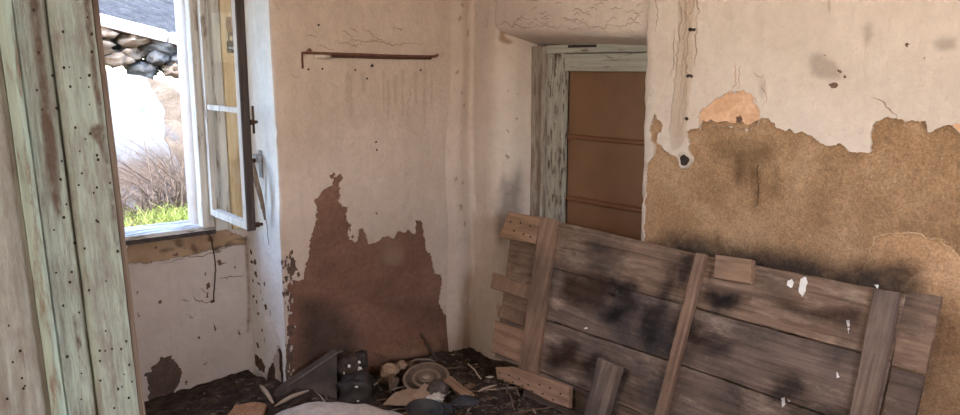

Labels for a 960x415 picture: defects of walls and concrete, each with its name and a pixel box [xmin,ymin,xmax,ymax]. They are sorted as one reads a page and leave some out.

crack [308,27,426,124]
crack [475,0,700,141]
flaking render [644,90,960,276]
flaking render [144,355,188,400]
flaking render [253,172,449,383]
flaking render [682,365,826,415]
flaking render [696,308,861,353]
flaking render [880,309,960,415]